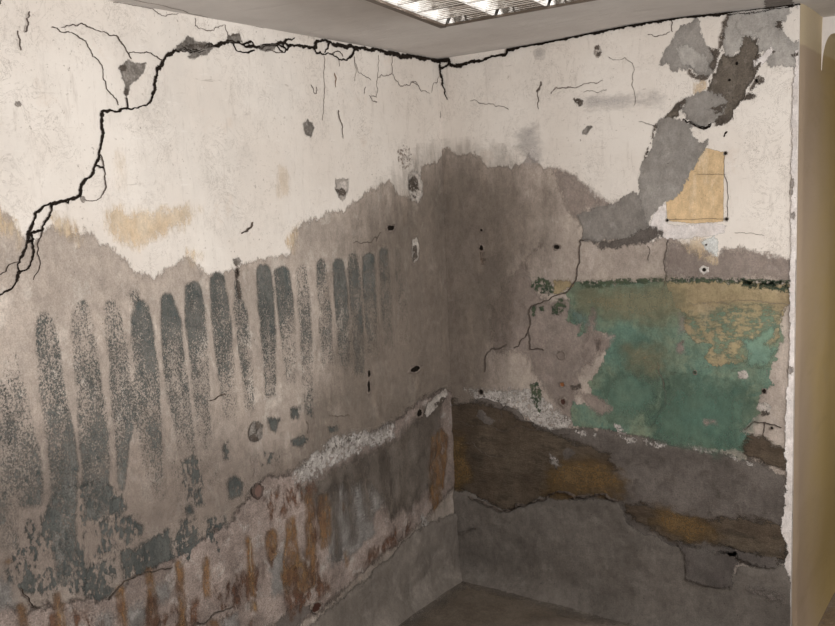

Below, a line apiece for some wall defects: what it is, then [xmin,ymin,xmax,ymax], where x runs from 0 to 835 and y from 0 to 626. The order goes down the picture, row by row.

flaking render [303,119,314,138]
flaking render [335,178,349,201]
crack [0,0,801,295]
flaking render [396,145,423,204]
crack [484,239,590,372]
peeling [468,4,799,607]
flaking render [0,248,463,626]
damp [0,147,796,626]
corrosion [429,429,448,511]
corrosion [49,593,93,626]
corrosion [147,537,259,626]
corrosion [265,482,331,619]